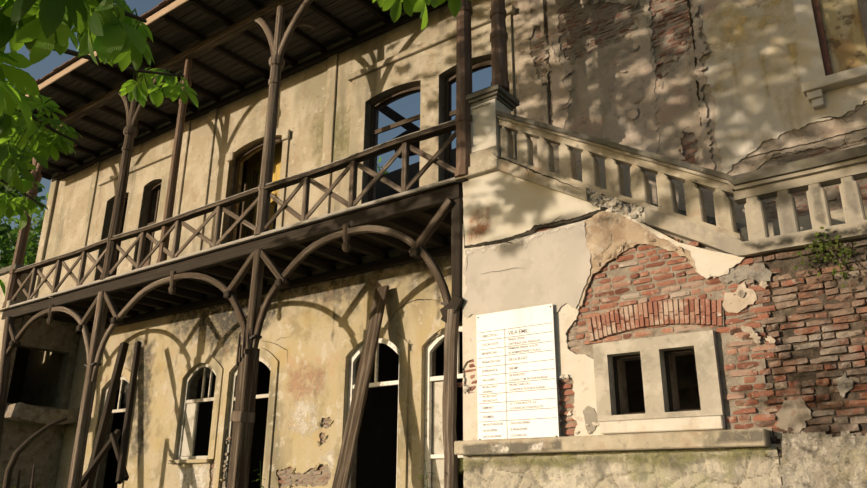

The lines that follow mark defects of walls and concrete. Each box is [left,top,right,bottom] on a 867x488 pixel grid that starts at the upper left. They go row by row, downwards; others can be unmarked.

peeling [520,0,716,170]
spalling [752,138,867,170]
corrosion [470,218,489,236]
crack [464,210,600,274]
spalling [822,184,843,211]
damp [260,255,451,327]
damp [125,339,151,450]
damp [170,298,249,353]
spalling [457,360,477,394]
spalling [557,374,599,437]
spalling [567,234,867,459]
spalling [275,463,331,488]